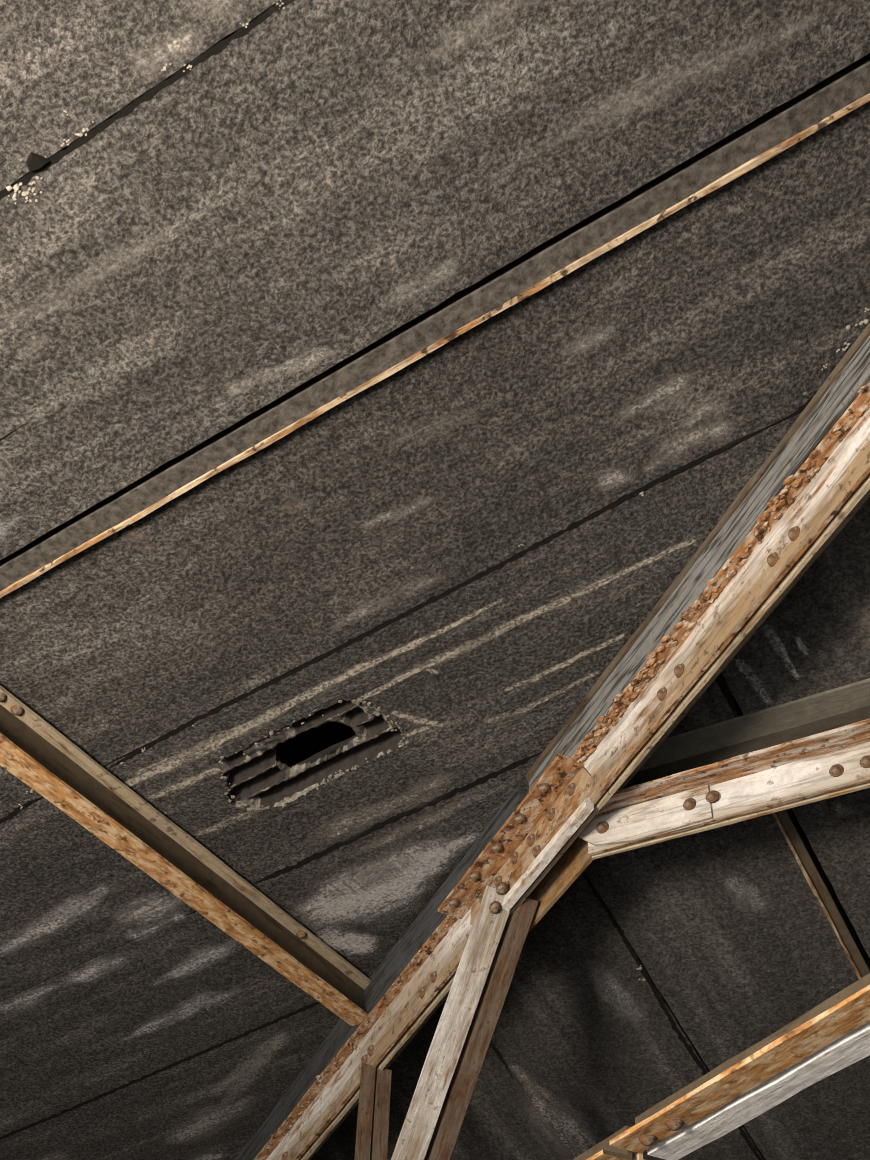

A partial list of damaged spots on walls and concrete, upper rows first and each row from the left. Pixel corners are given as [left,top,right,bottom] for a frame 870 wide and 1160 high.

damp [356,539,696,702]
damp [124,599,503,787]
damp [488,672,599,723]
damp [148,768,221,799]
hole [213,699,409,811]